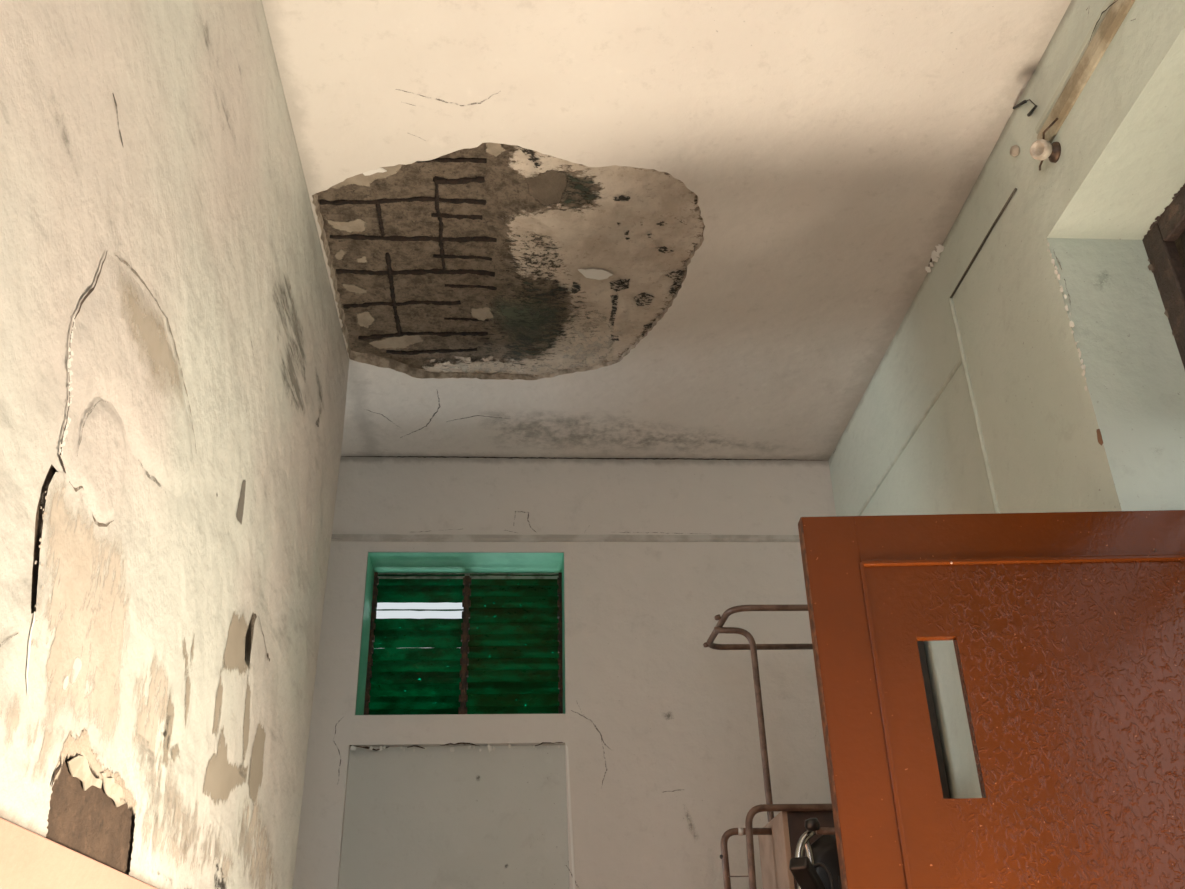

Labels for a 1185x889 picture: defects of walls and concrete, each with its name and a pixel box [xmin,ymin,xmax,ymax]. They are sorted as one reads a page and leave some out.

spalling [312,142,705,380]
crack [342,389,791,460]
crack [7,455,66,695]